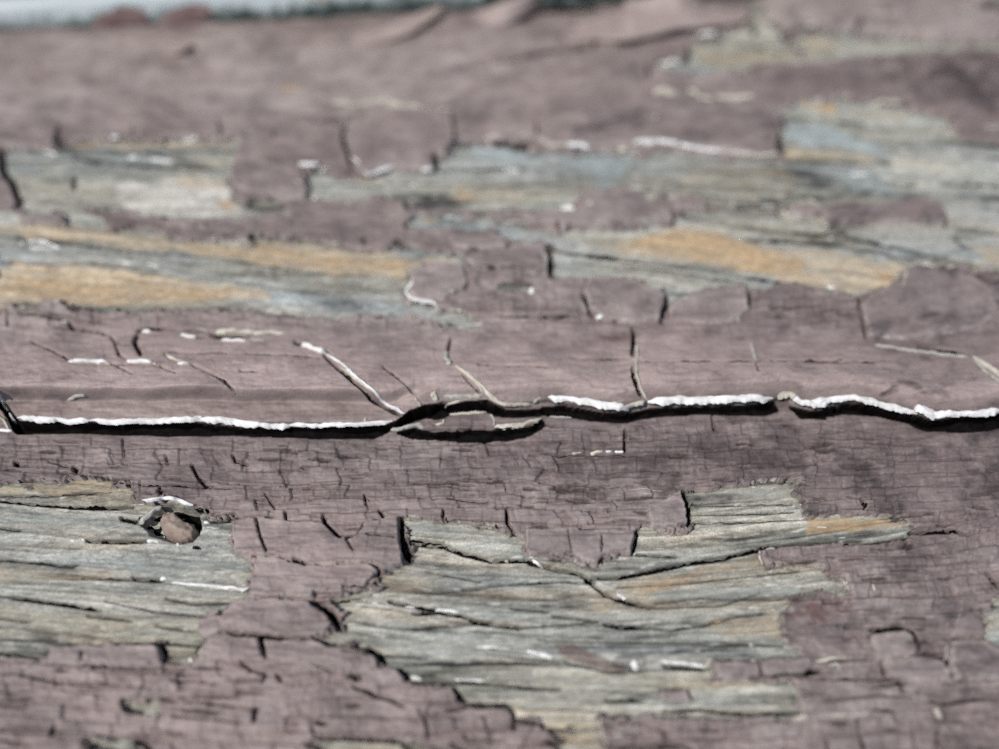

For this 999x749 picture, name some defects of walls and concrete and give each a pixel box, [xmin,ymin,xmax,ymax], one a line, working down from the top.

peeling [0,87,999,340]
crack [501,313,576,321]
crack [7,311,319,394]
crack [804,357,873,365]
crack [139,459,237,524]
crack [442,498,514,536]
crack [916,529,964,537]
peeling [0,477,999,749]
crack [1,673,118,686]
crack [240,661,282,682]
crack [171,701,258,724]
crack [352,676,564,749]